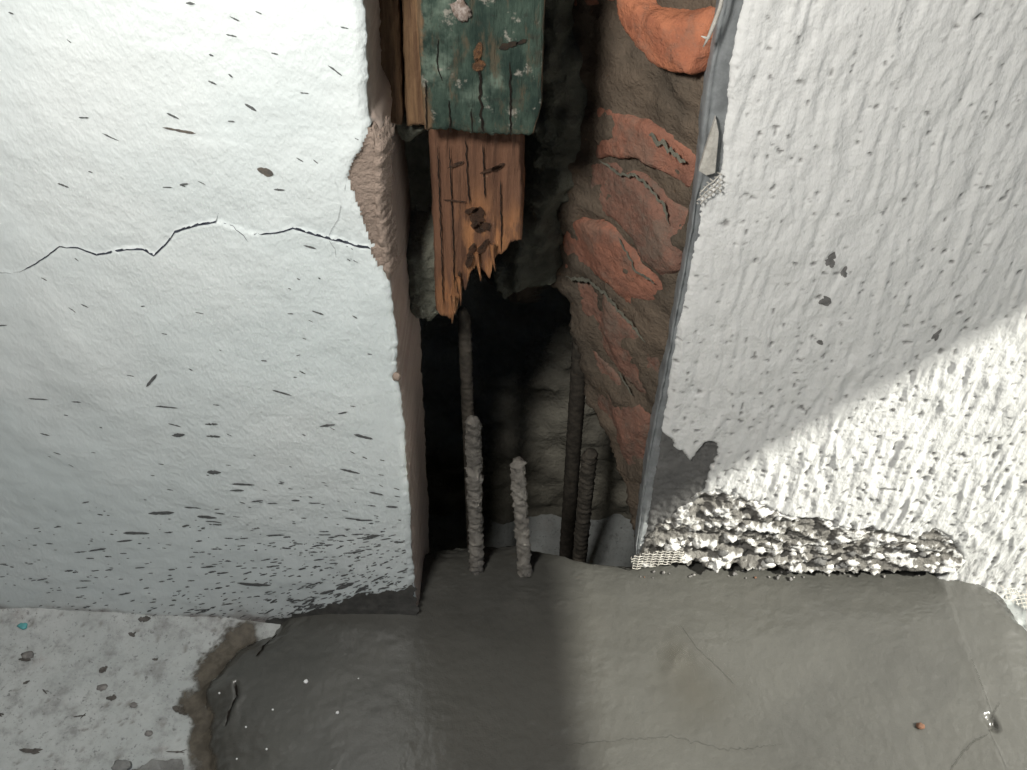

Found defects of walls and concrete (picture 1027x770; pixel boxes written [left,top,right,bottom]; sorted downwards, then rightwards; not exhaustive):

crack [14,216,370,273]
peeling [348,114,401,280]
spalling [457,307,485,575]
spalling [509,456,533,577]
spalling [559,337,598,563]
flaking render [637,432,965,576]
spalling [111,759,184,770]